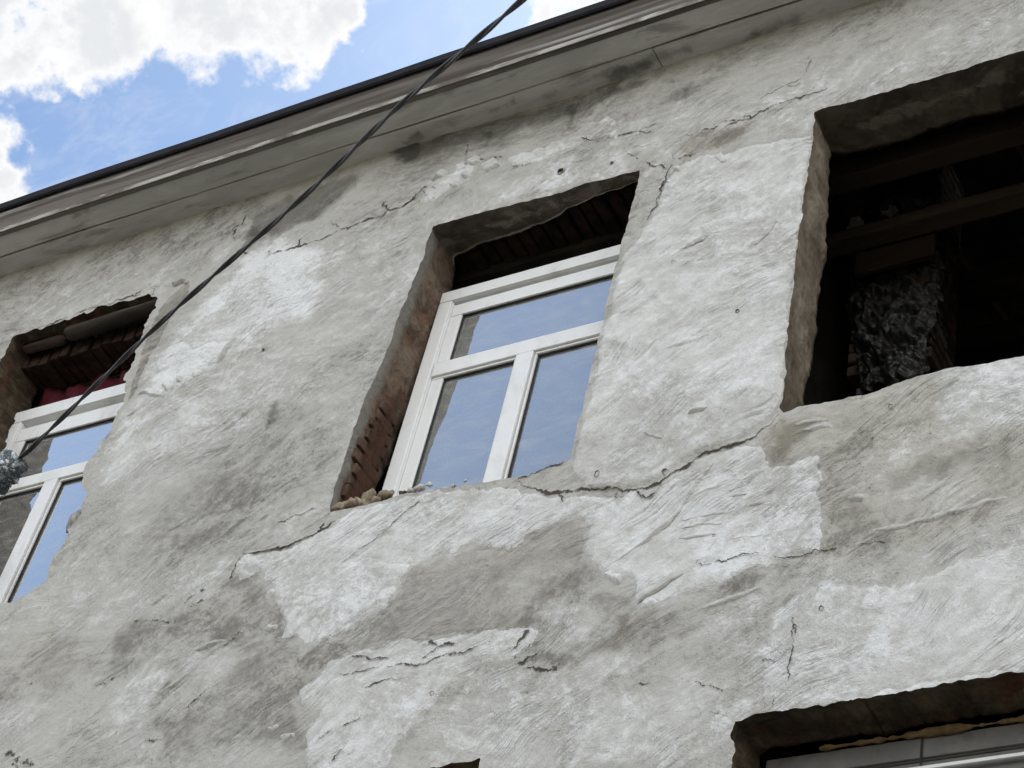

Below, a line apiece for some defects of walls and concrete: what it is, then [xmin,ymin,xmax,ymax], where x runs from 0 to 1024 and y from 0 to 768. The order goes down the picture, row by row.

crack [582,57,827,220]
crack [232,179,454,255]
crack [514,410,781,501]
crack [696,541,885,568]
crack [342,630,559,688]
crack [762,617,797,705]